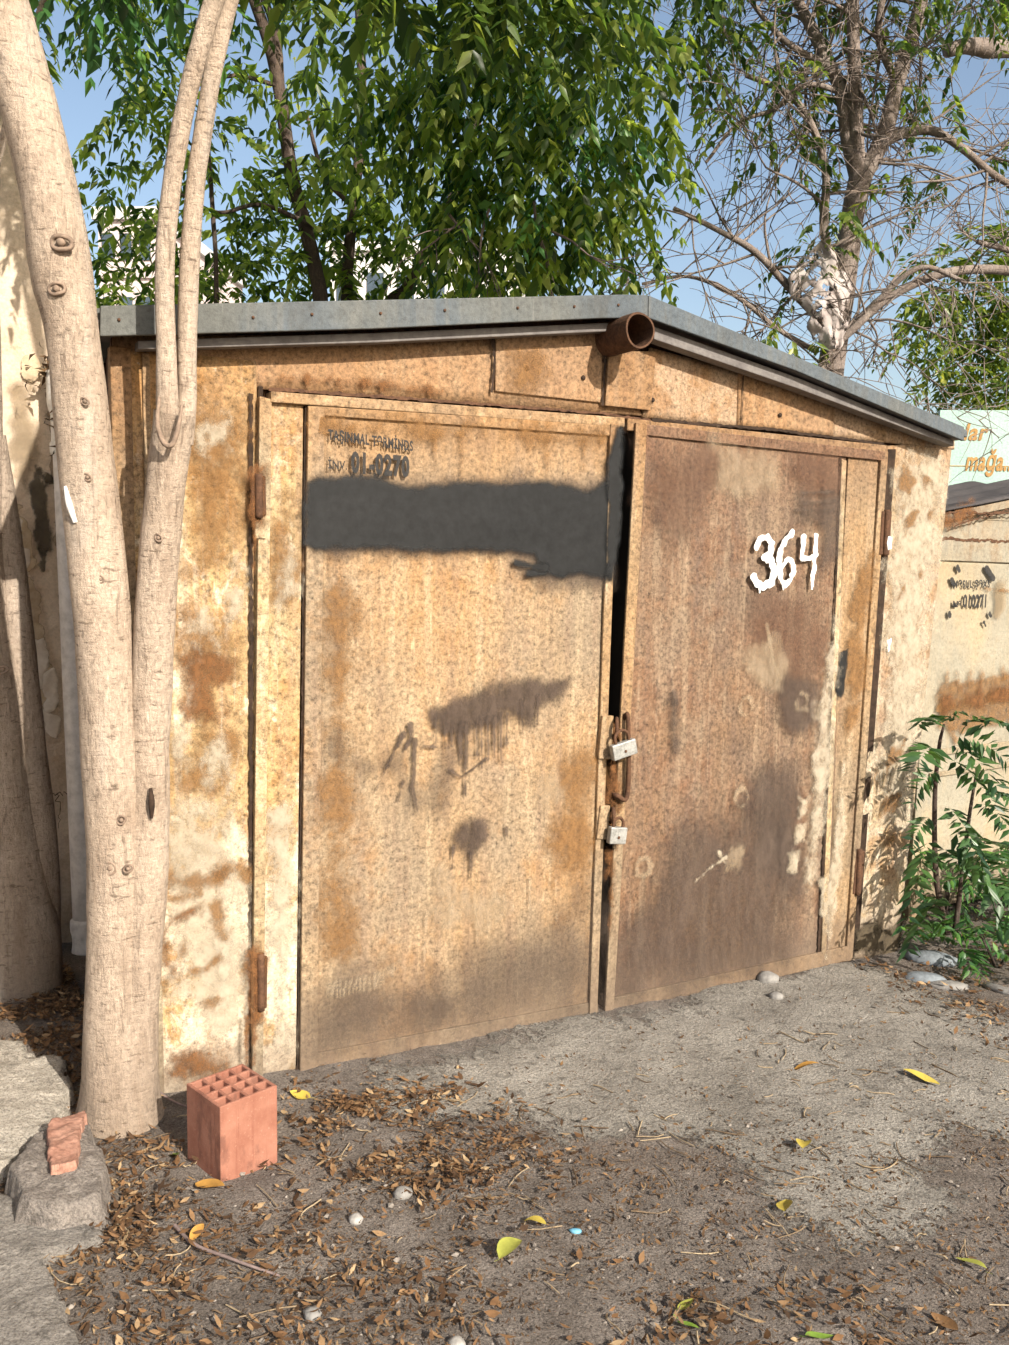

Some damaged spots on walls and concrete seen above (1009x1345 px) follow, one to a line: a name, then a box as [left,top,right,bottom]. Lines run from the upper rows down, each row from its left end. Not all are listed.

rust [183,395,303,603]
rust [177,610,239,791]
rust [937,668,1009,744]
peeling [788,630,846,934]
rust [162,862,253,984]
rust [172,1050,229,1078]
rust [244,945,269,1065]